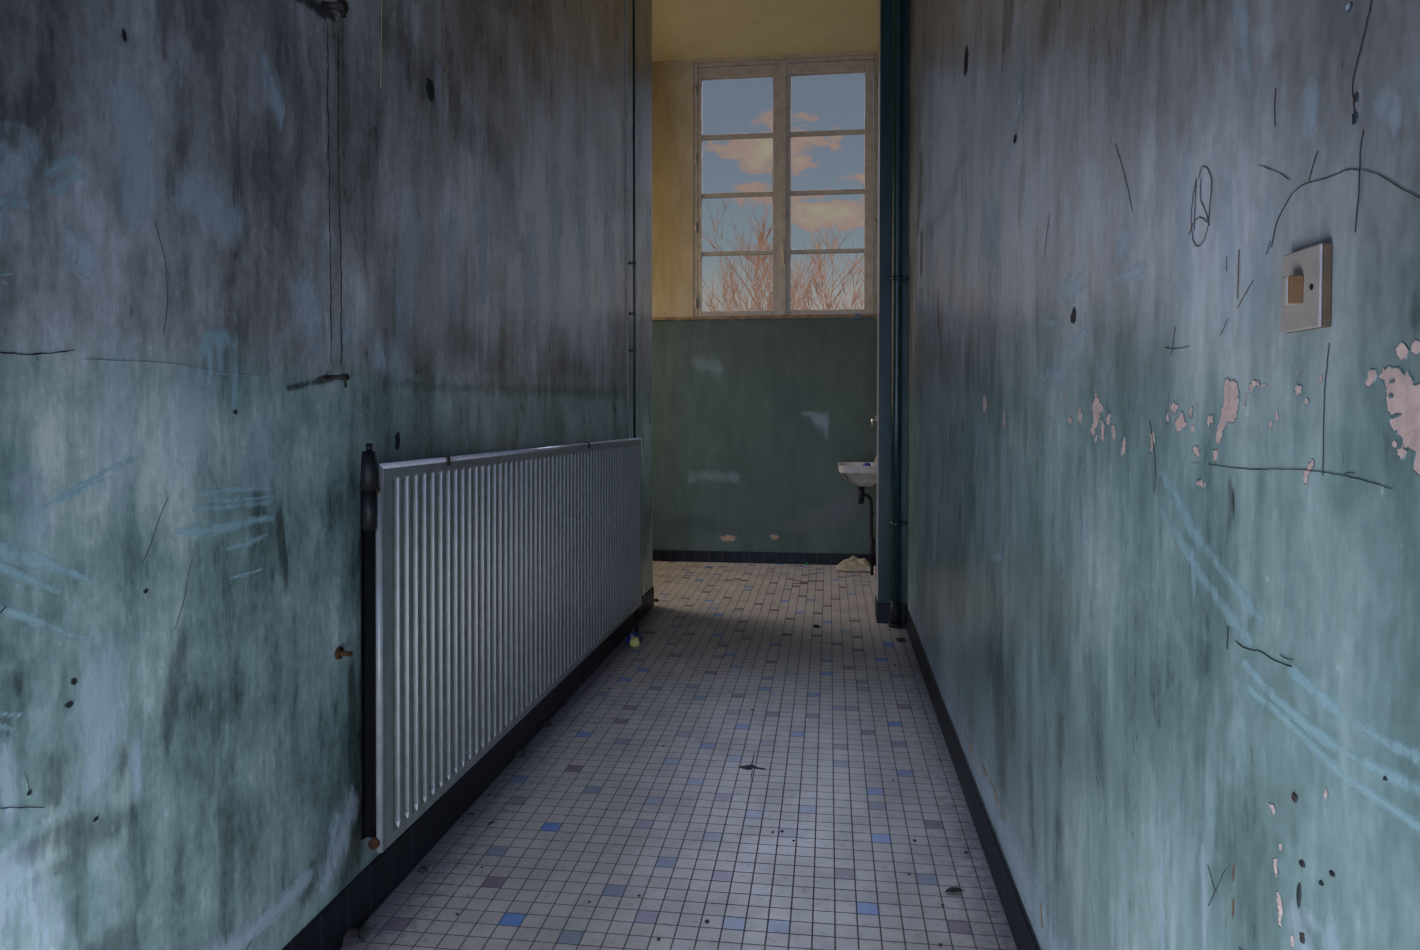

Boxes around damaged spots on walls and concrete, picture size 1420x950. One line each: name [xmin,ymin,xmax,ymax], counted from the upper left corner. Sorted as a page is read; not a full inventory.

peeling [1065,390,1127,458]
peeling [1149,377,1272,464]
peeling [1365,339,1420,477]